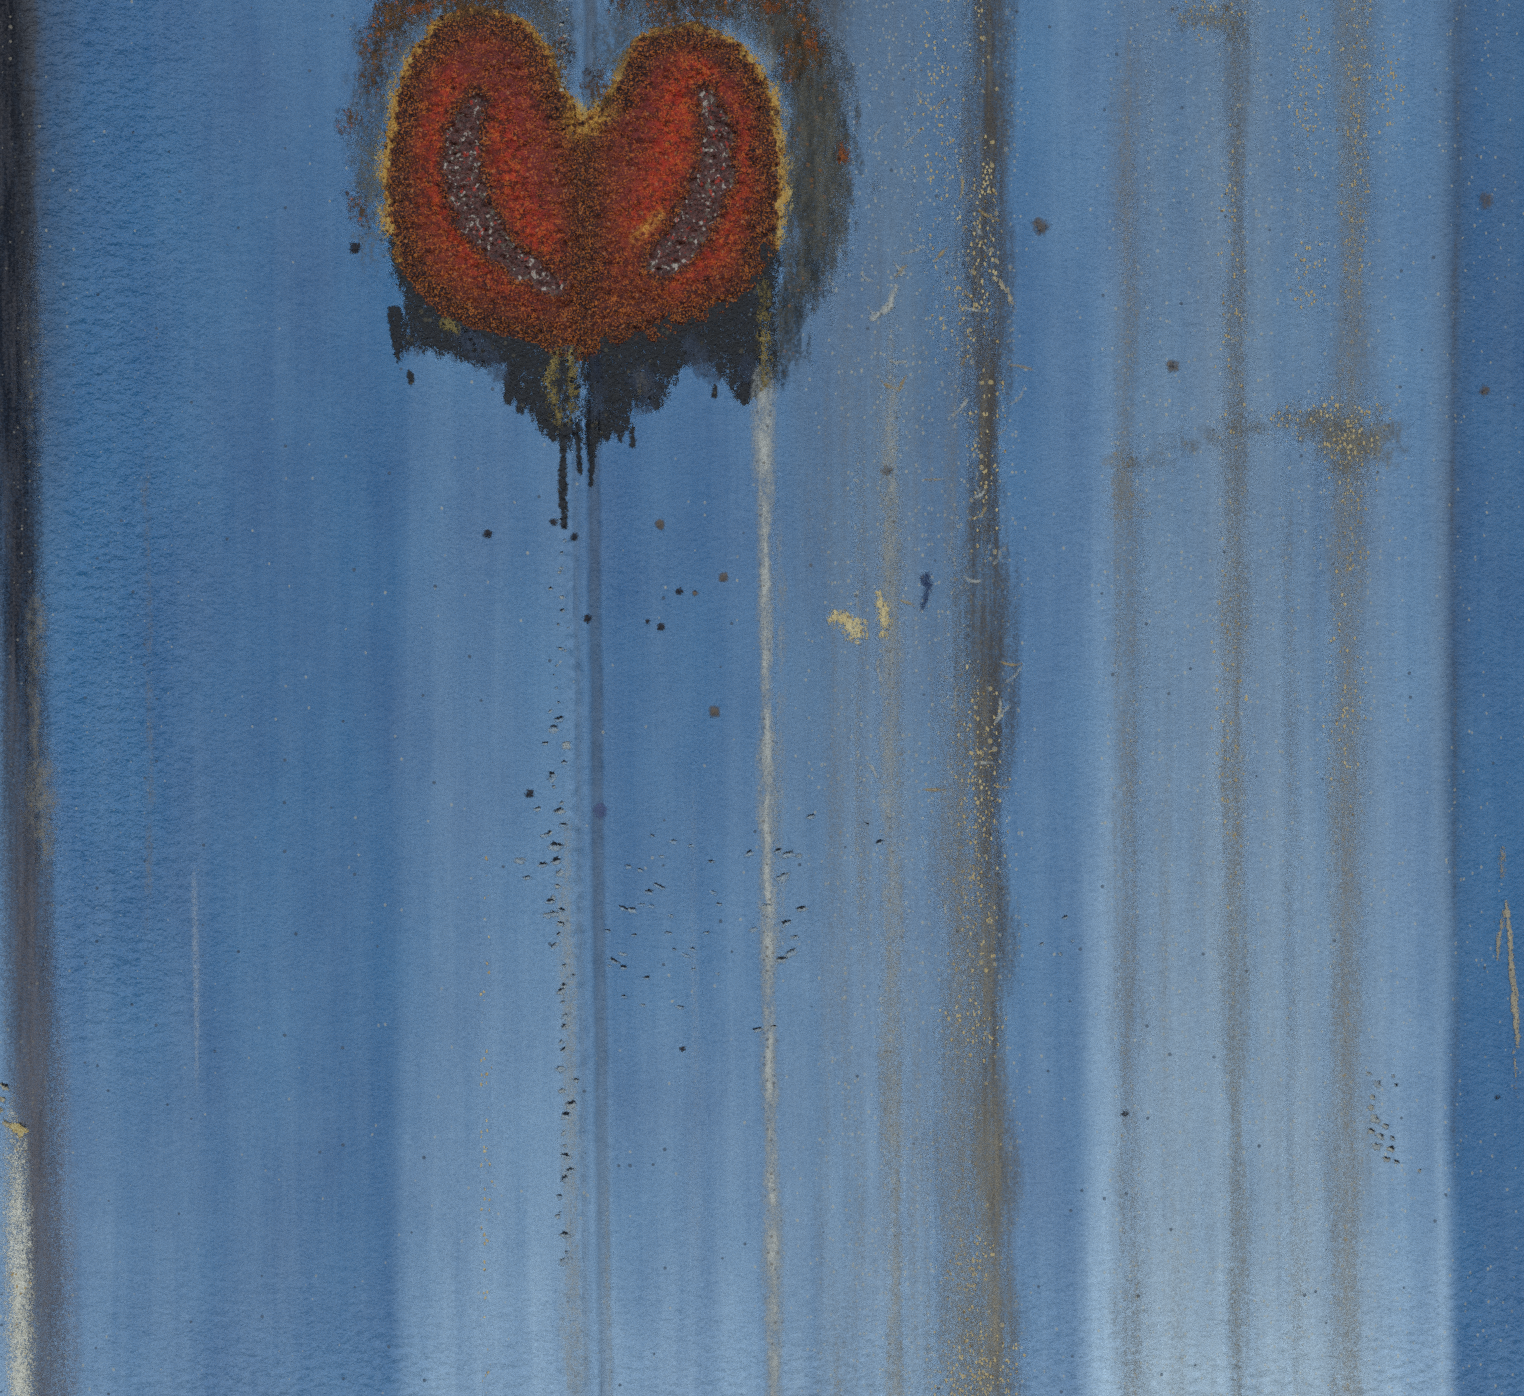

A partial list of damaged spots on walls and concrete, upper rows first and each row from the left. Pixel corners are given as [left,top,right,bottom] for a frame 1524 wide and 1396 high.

rust [345,0,830,363]
rust [906,0,1026,1396]